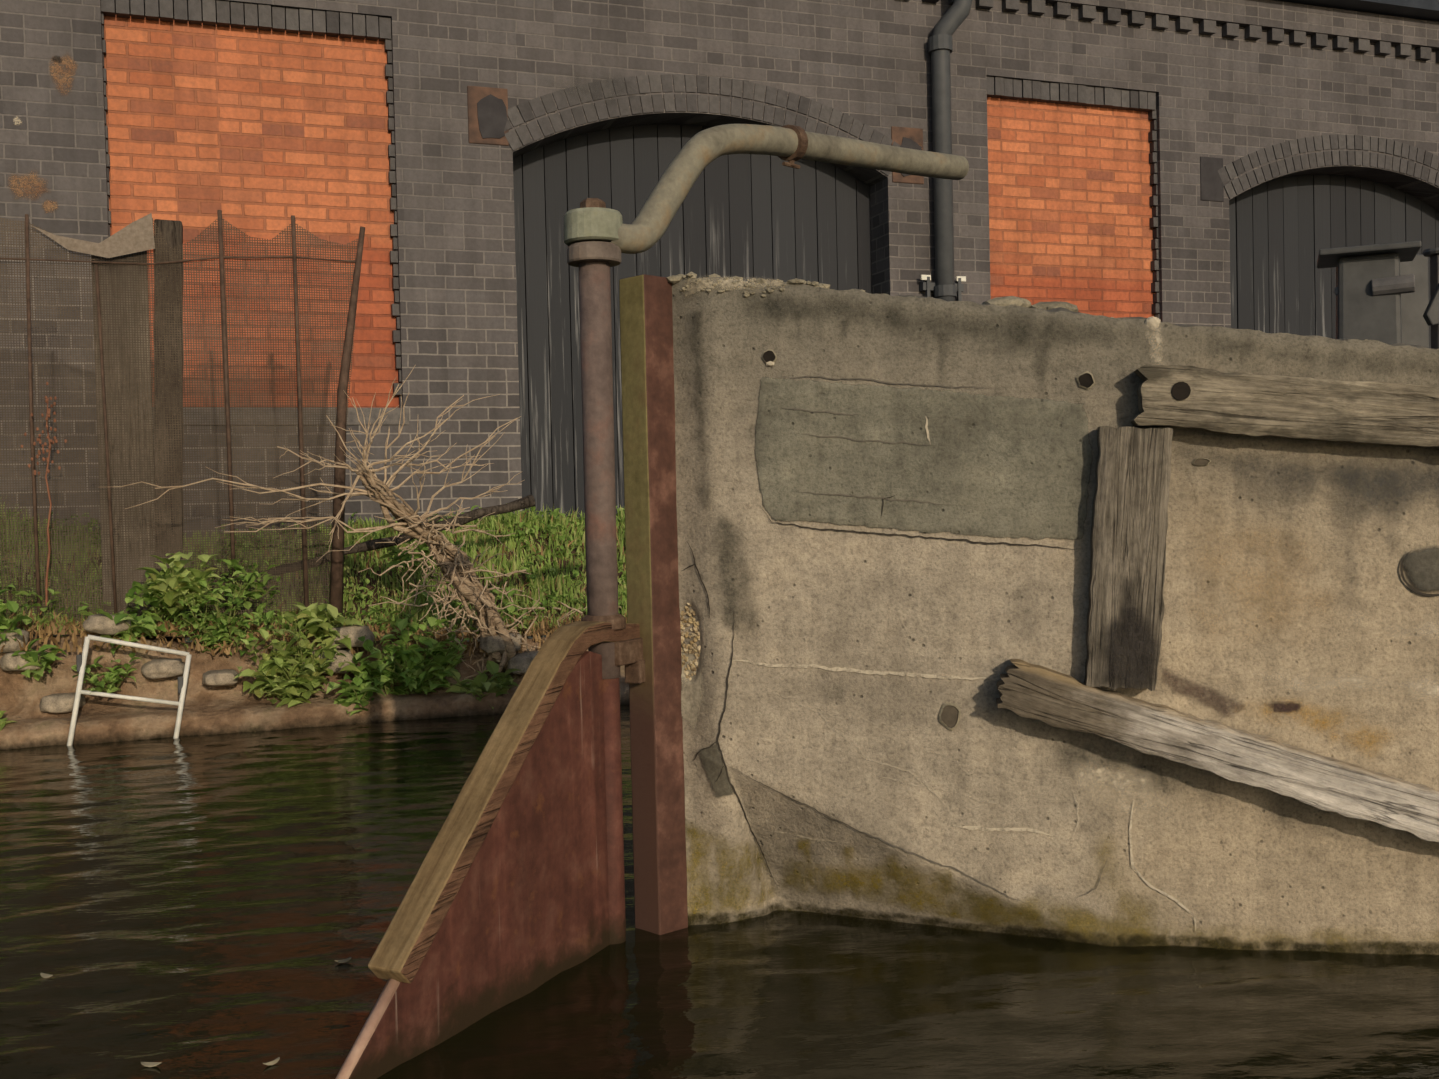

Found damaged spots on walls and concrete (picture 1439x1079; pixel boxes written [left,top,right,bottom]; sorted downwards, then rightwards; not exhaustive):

crack [682,542,1034,908]
corrosion [1164,671,1239,714]
corrosion [1272,703,1300,712]
water stain [688,754,1439,955]